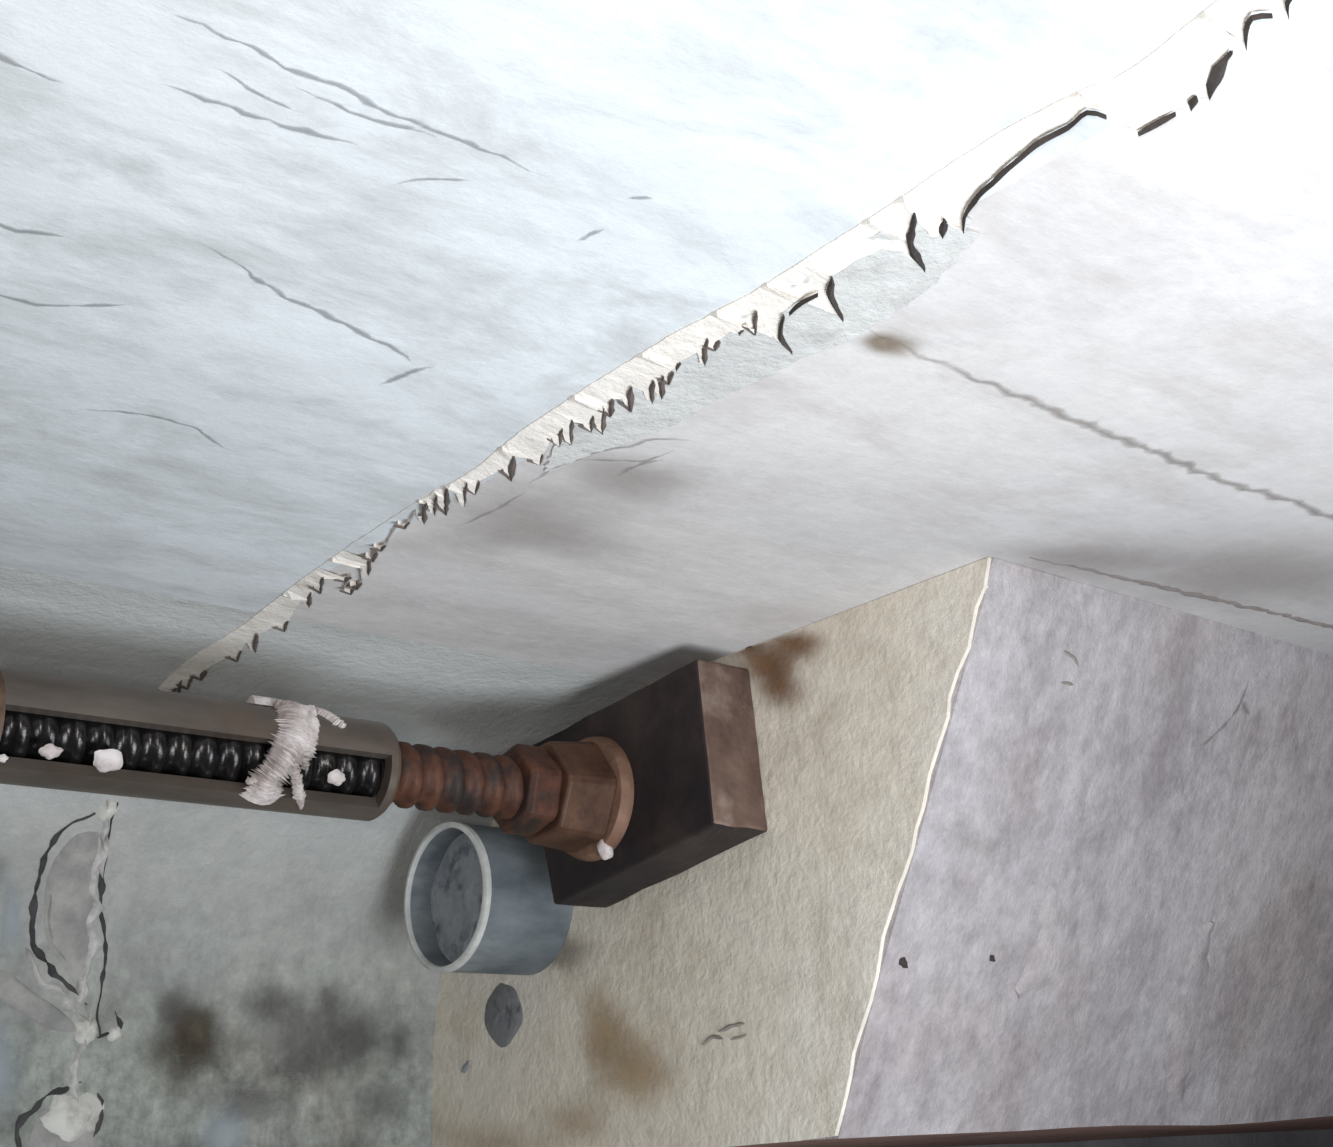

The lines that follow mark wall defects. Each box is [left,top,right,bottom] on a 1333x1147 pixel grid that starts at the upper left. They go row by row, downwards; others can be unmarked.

crack [158,0,1333,693]
corrosion [742,637,814,698]
crack [0,799,123,1147]
leakage [161,1013,213,1072]